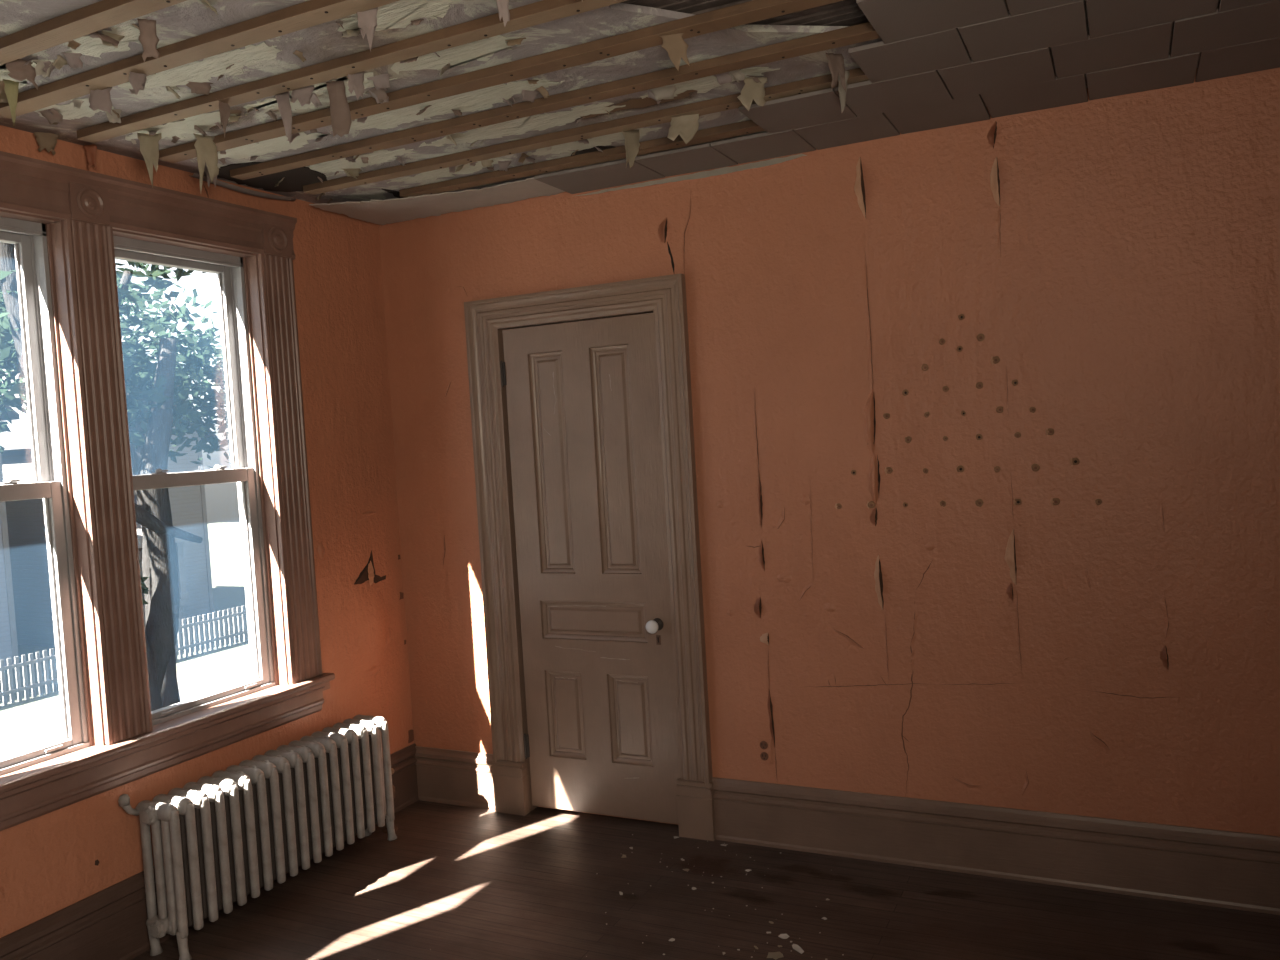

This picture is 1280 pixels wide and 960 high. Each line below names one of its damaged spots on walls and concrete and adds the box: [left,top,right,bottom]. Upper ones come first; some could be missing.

peeling [0,0,700,204]
peeling [640,33,778,111]
peeling [826,53,849,112]
flaking render [577,153,807,196]
crack [667,190,691,273]
spalling [354,550,386,586]
crack [806,560,1016,796]